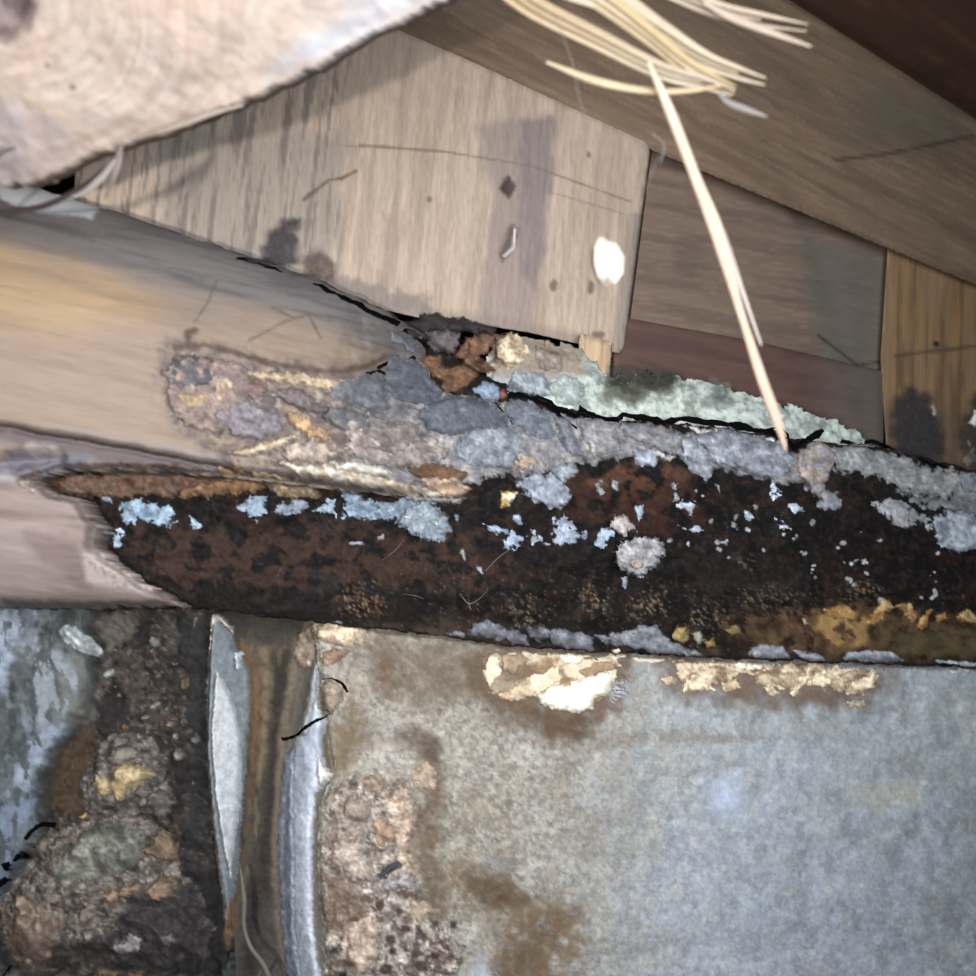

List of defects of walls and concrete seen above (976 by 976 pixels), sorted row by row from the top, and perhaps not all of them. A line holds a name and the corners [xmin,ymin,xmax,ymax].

mould [608,365,676,392]
leakage [891,389,943,457]
mould [951,397,976,472]
corrosion [19,463,320,500]
spalling [448,620,904,736]
corrosion [746,598,976,664]
peeling [924,660,976,674]
leakage [0,610,78,879]
peeling [206,614,253,926]
spalling [277,621,465,976]